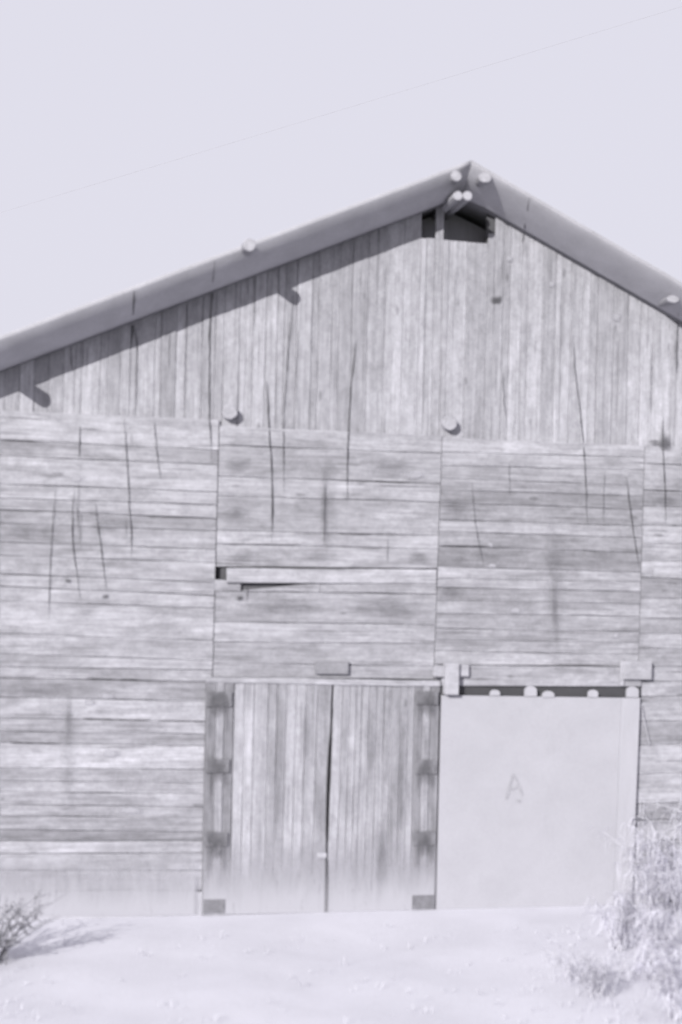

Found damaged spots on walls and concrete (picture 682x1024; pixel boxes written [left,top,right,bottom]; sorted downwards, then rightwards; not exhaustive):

crack [130,294,138,368]
crack [49,483,106,600]
crack [124,404,161,549]
crack [266,297,298,544]
crack [324,338,357,538]
crack [573,341,640,567]
crack [660,429,668,517]